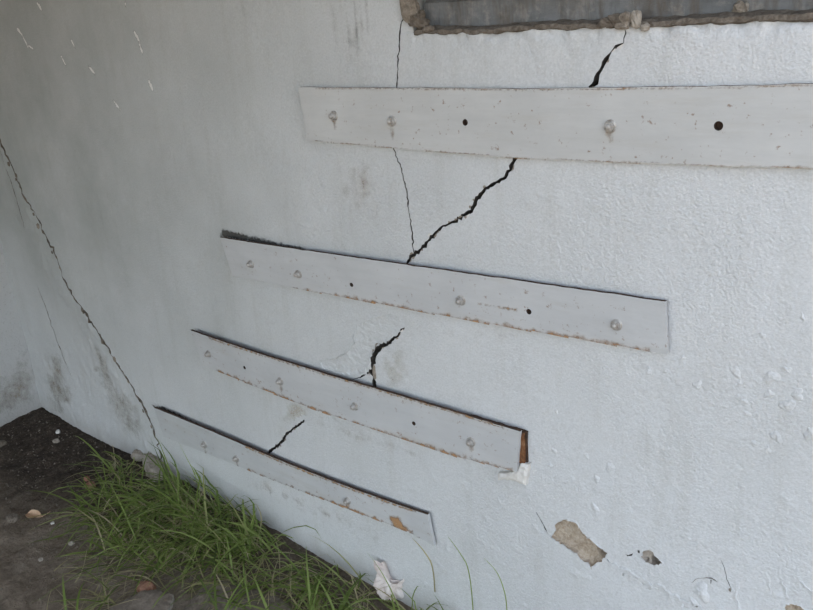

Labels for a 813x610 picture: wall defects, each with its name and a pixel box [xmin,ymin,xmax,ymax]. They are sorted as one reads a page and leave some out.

crack [588,30,626,87]
crack [393,148,517,264]
crack [0,139,162,459]
peeling [318,314,400,375]
crack [350,327,405,387]
crack [267,420,304,454]
corrosion [307,406,461,458]
flaking render [498,462,532,485]
corrosion [292,487,411,533]
spalling [550,518,607,569]
spalling [627,550,666,567]
spalling [784,602,807,610]